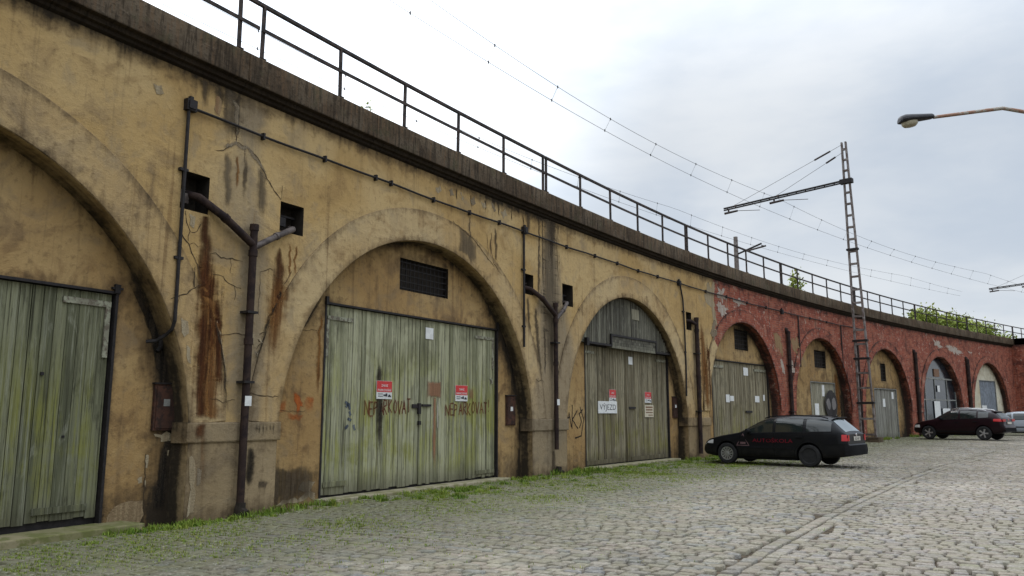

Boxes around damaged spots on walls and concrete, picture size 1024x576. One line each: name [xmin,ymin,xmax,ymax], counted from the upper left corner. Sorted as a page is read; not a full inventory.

water stain [225,156,266,209]
crack [216,99,283,199]
rust [196,216,222,436]
crack [171,210,306,412]
rust [269,247,297,347]
flaking render [704,282,746,341]
water stain [246,449,312,501]